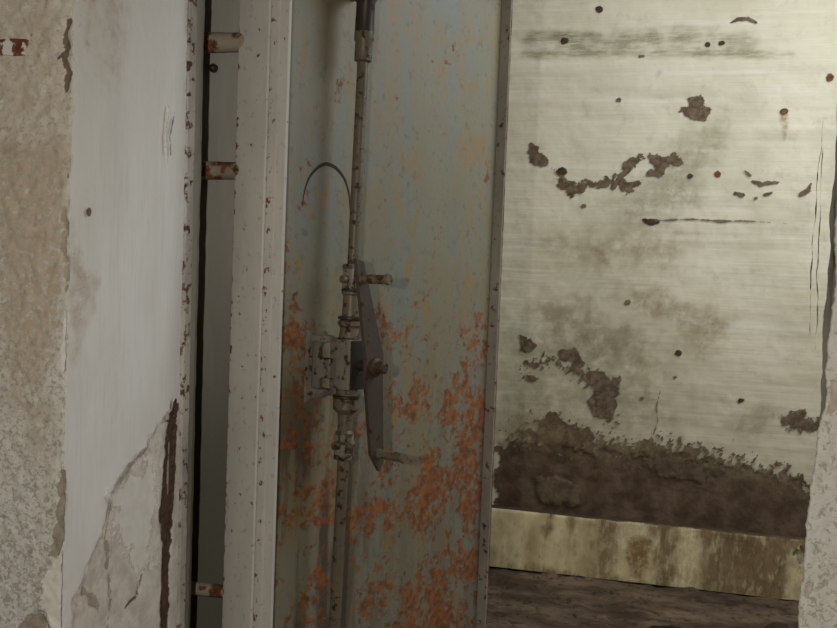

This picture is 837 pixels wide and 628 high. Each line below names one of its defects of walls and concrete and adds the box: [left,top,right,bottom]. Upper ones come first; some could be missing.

peeling [679,95,712,122]
peeling [528,142,684,198]
water stain [0,144,64,378]
flaking render [494,335,810,538]
peeling [781,408,820,434]
flaking render [18,469,66,628]
peeling [73,408,182,628]
water stain [599,519,629,580]
water stain [650,524,805,599]